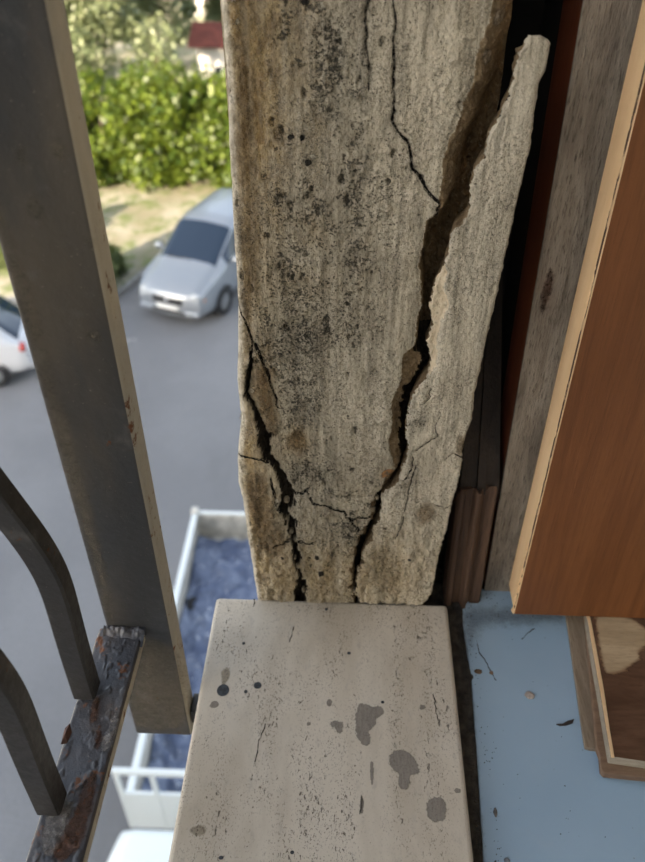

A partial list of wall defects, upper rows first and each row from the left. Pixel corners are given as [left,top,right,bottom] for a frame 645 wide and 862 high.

crack [363,0,371,91]
crack [391,3,440,216]
crack [238,301,434,603]
rust [54,773,96,861]